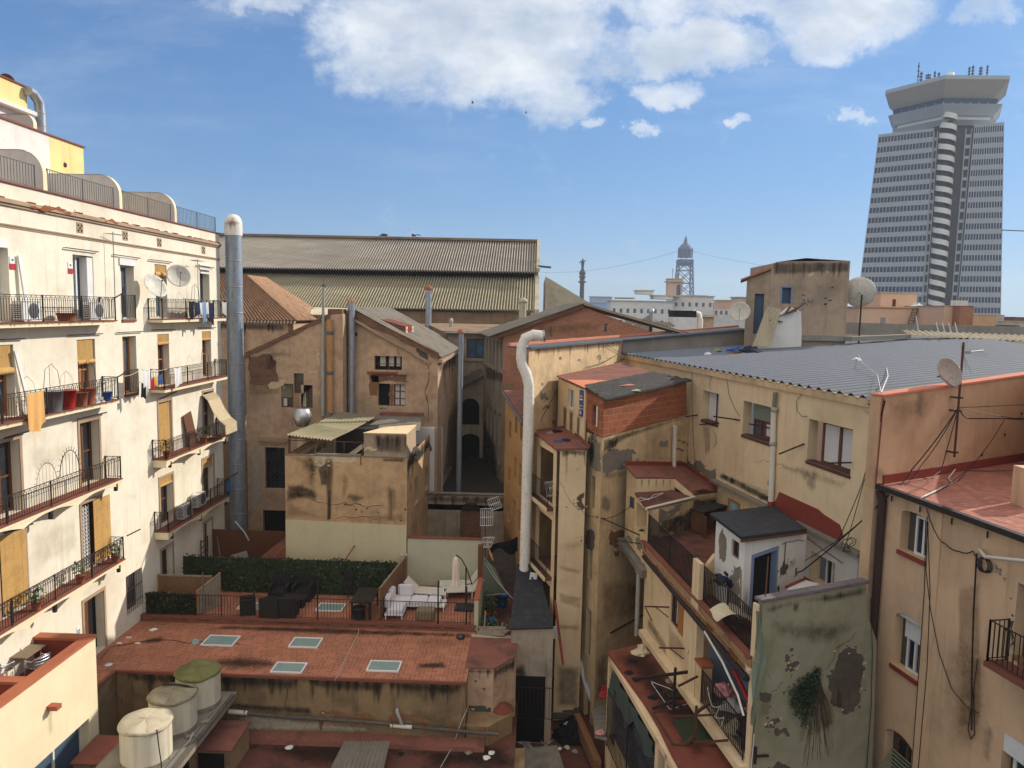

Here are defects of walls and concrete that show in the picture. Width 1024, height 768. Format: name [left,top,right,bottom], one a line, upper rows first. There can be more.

flaking render [248,352,286,391]
peeling [589,433,645,475]
damp [288,462,332,518]
crack [307,498,388,520]
peeling [718,528,741,615]
damp [311,680,457,700]
peeling [826,645,867,715]
damp [231,705,363,730]